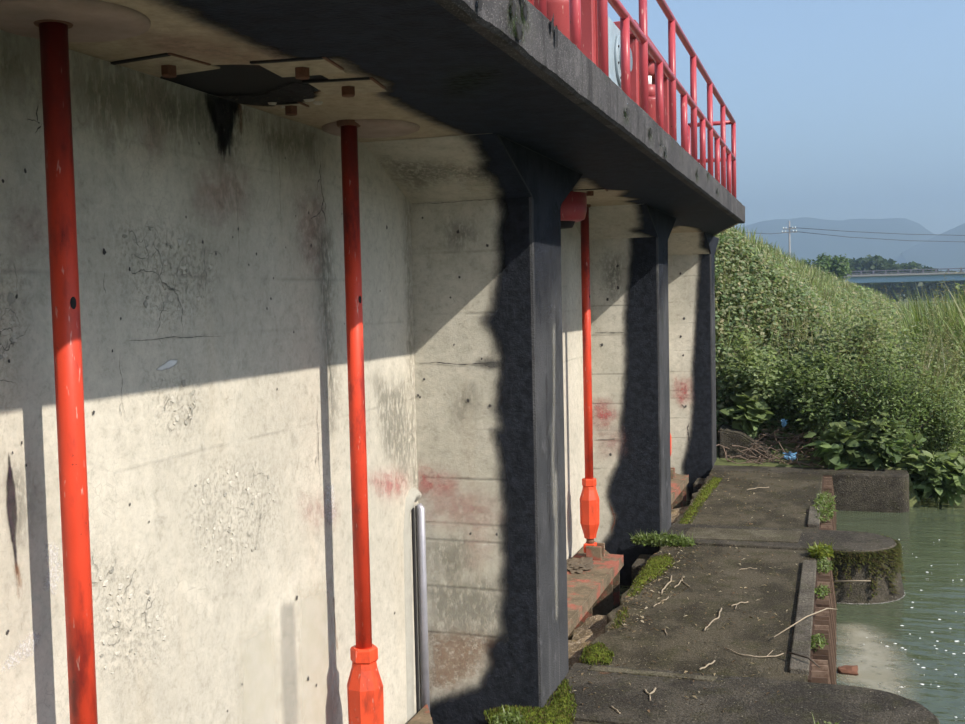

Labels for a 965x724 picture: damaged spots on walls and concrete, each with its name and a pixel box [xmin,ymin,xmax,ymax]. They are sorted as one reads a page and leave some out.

crack [128,230,219,343]
water stain [159,0,738,724]
crack [419,360,500,368]
water stain [46,545,59,591]